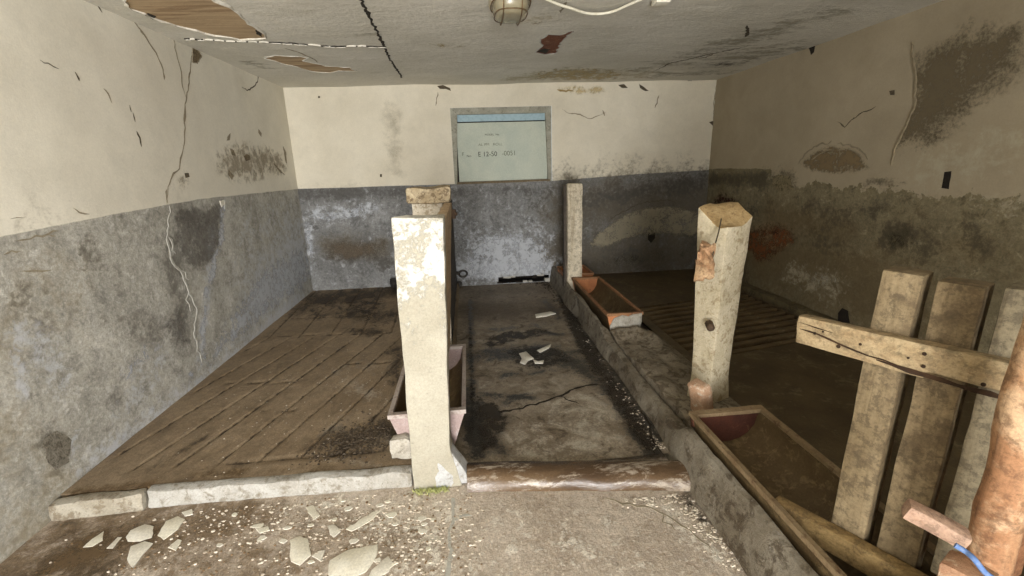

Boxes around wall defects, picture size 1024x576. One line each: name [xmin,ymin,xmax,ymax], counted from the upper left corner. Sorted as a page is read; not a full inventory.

flaking render [122,0,267,41]
flaking render [535,30,573,55]
flaking render [264,55,358,73]
damp [223,133,287,179]
crack [134,0,402,361]
corrosion [748,224,794,262]
damp [176,200,312,358]
crack [480,384,609,419]